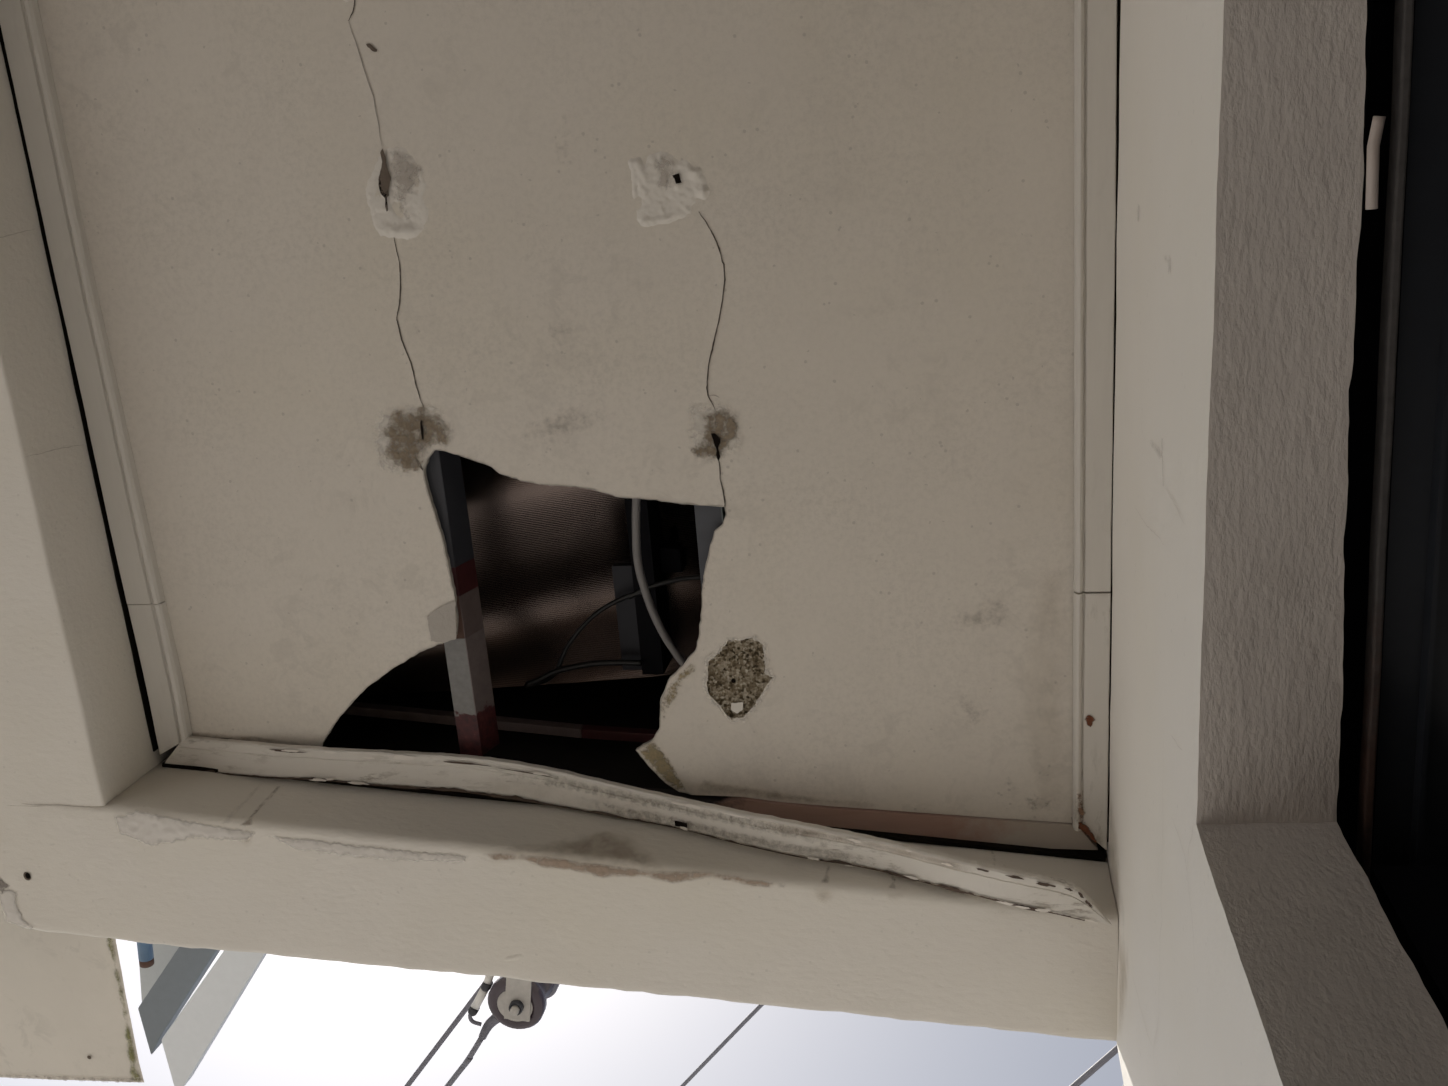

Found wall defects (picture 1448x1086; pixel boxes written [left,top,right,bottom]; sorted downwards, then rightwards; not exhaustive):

crack [386,238,425,413]
crack [690,212,726,507]
spalling [324,407,773,809]
peeling [116,811,253,845]
peeling [187,769,1097,923]